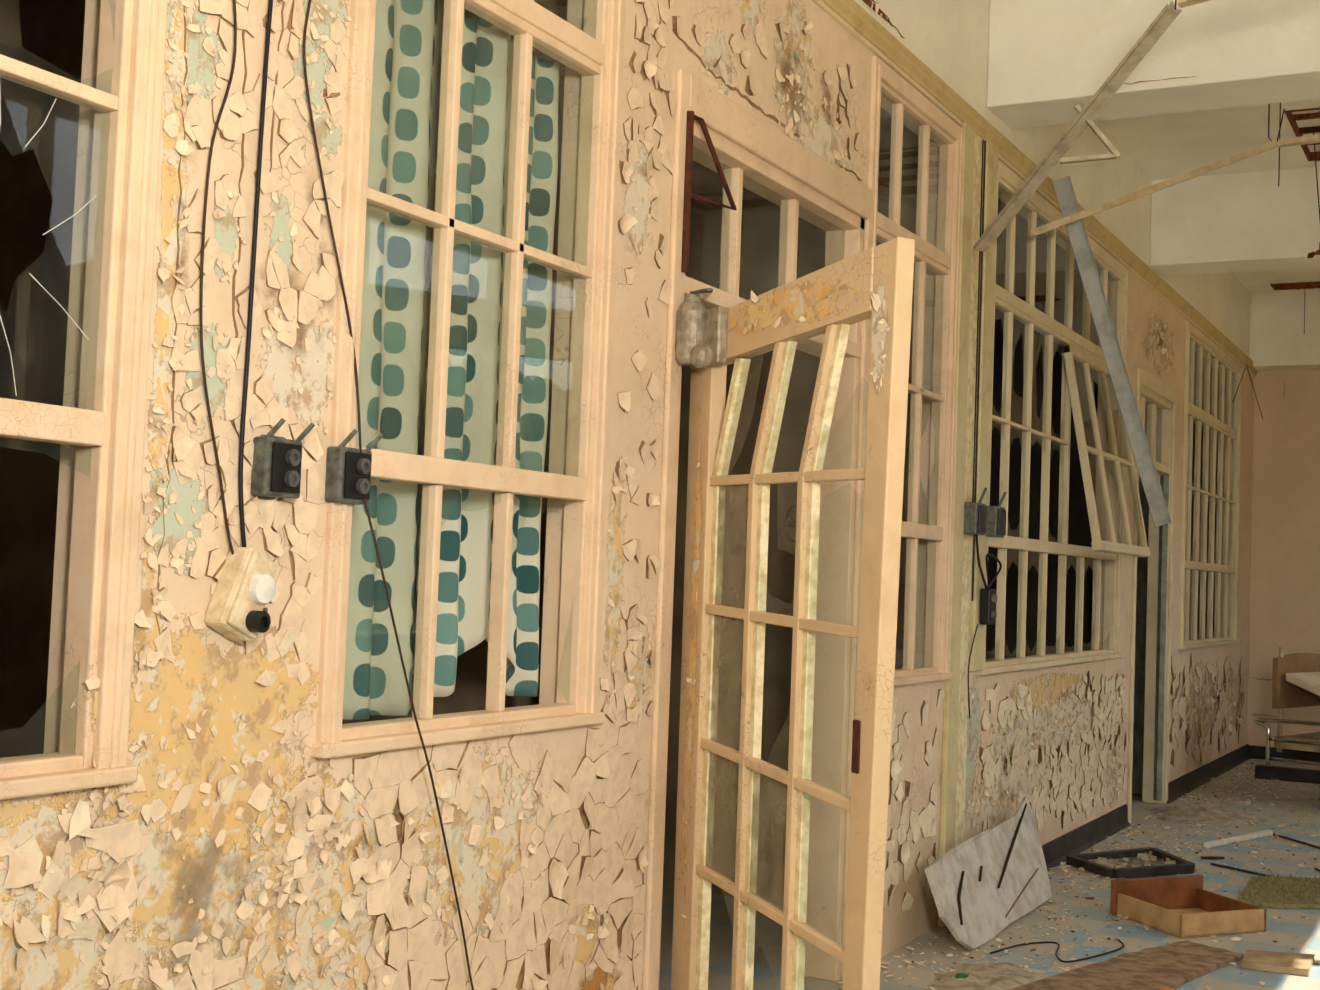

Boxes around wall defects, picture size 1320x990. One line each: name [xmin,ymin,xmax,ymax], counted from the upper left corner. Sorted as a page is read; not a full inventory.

peeling [622,134,653,264]
peeling [700,30,739,95]
peeling [736,0,851,172]
rust [1284,108,1320,161]
peeling [0,0,557,990]
peeling [604,453,654,725]
peeling [965,672,1119,831]
peeling [1175,659,1244,749]
peeling [561,904,616,990]